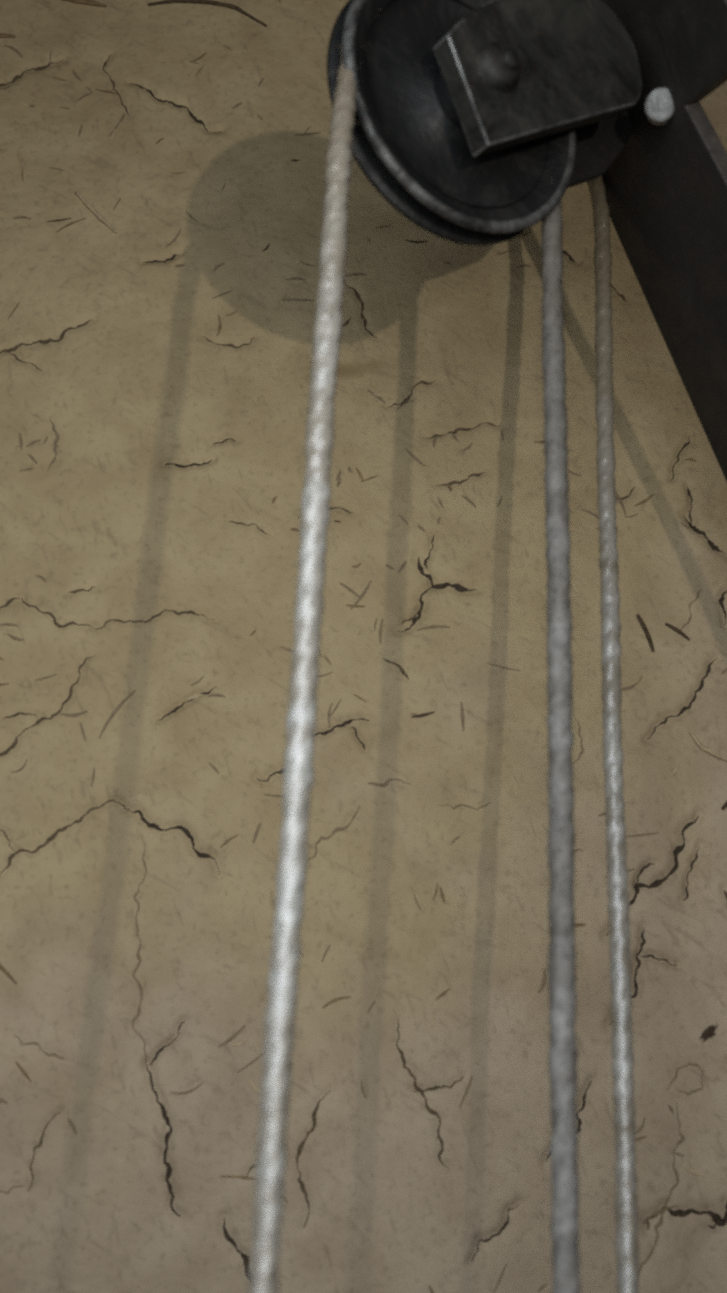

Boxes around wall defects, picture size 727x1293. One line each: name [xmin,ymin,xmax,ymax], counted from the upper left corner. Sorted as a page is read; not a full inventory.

crack [0,320,92,371]
crack [0,586,215,756]
crack [257,768,284,781]
crack [314,718,370,750]
crack [308,778,409,860]
crack [383,534,476,680]
crack [629,815,699,998]
crack [0,800,219,1217]
crack [396,1014,464,1166]
crack [638,1063,727,1281]
crack [223,1218,250,1280]